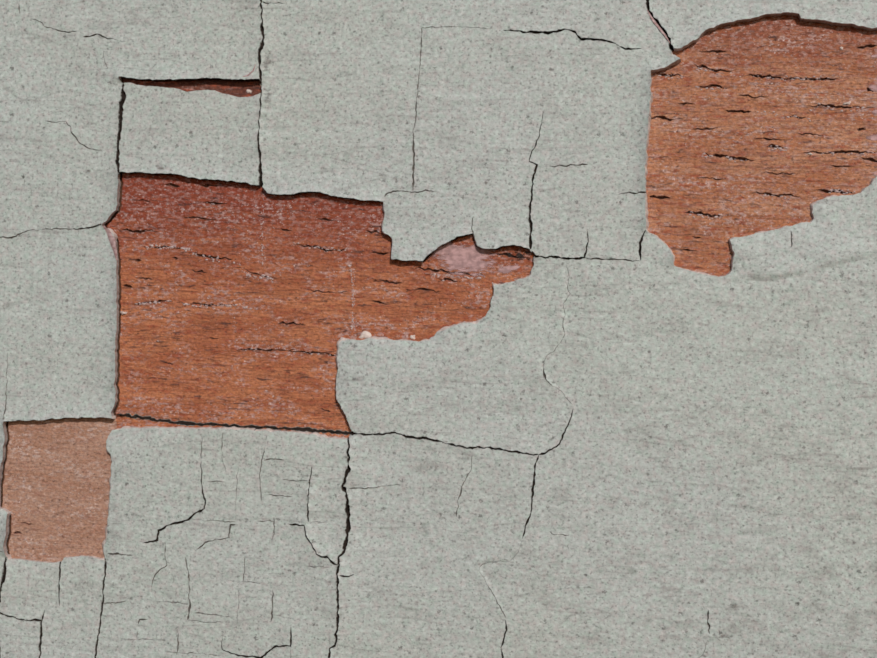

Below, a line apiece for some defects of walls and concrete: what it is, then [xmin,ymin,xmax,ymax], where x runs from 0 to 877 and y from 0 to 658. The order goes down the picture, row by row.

crack [646,0,674,51]
crack [384,26,642,197]
peeling [645,10,877,277]
crack [1,353,9,420]
crack [0,224,101,239]
peeling [0,64,535,563]
crack [94,111,646,658]
crack [0,551,61,658]